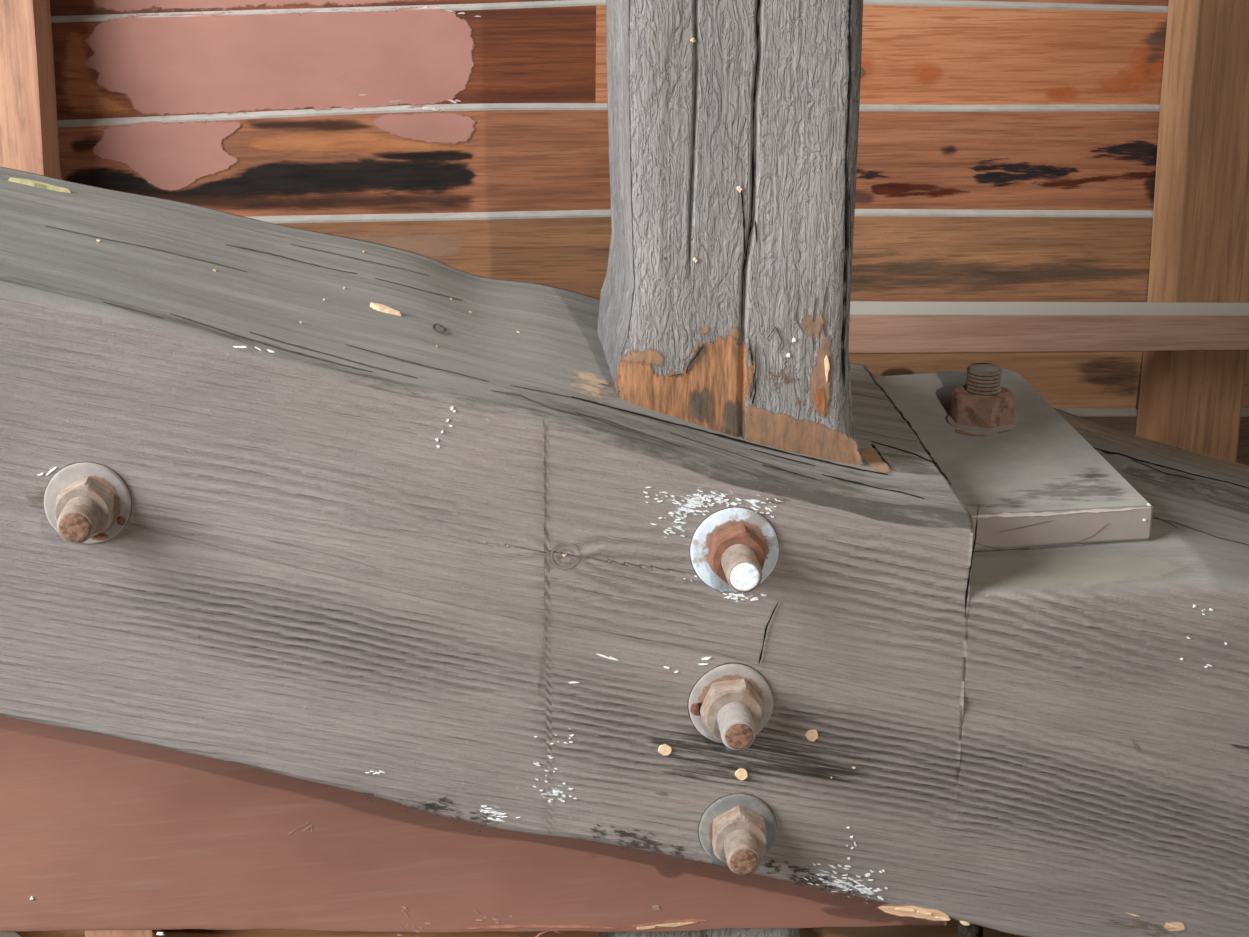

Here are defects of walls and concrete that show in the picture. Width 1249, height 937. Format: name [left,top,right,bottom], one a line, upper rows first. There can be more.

leakage [72,139,100,151]
leakage [66,151,475,209]
leakage [253,121,365,130]
leakage [855,140,1157,201]
peeling [615,314,889,473]
rust [89,476,126,540]
rust [703,520,769,558]
rust [690,675,763,716]
crack [634,601,1183,758]